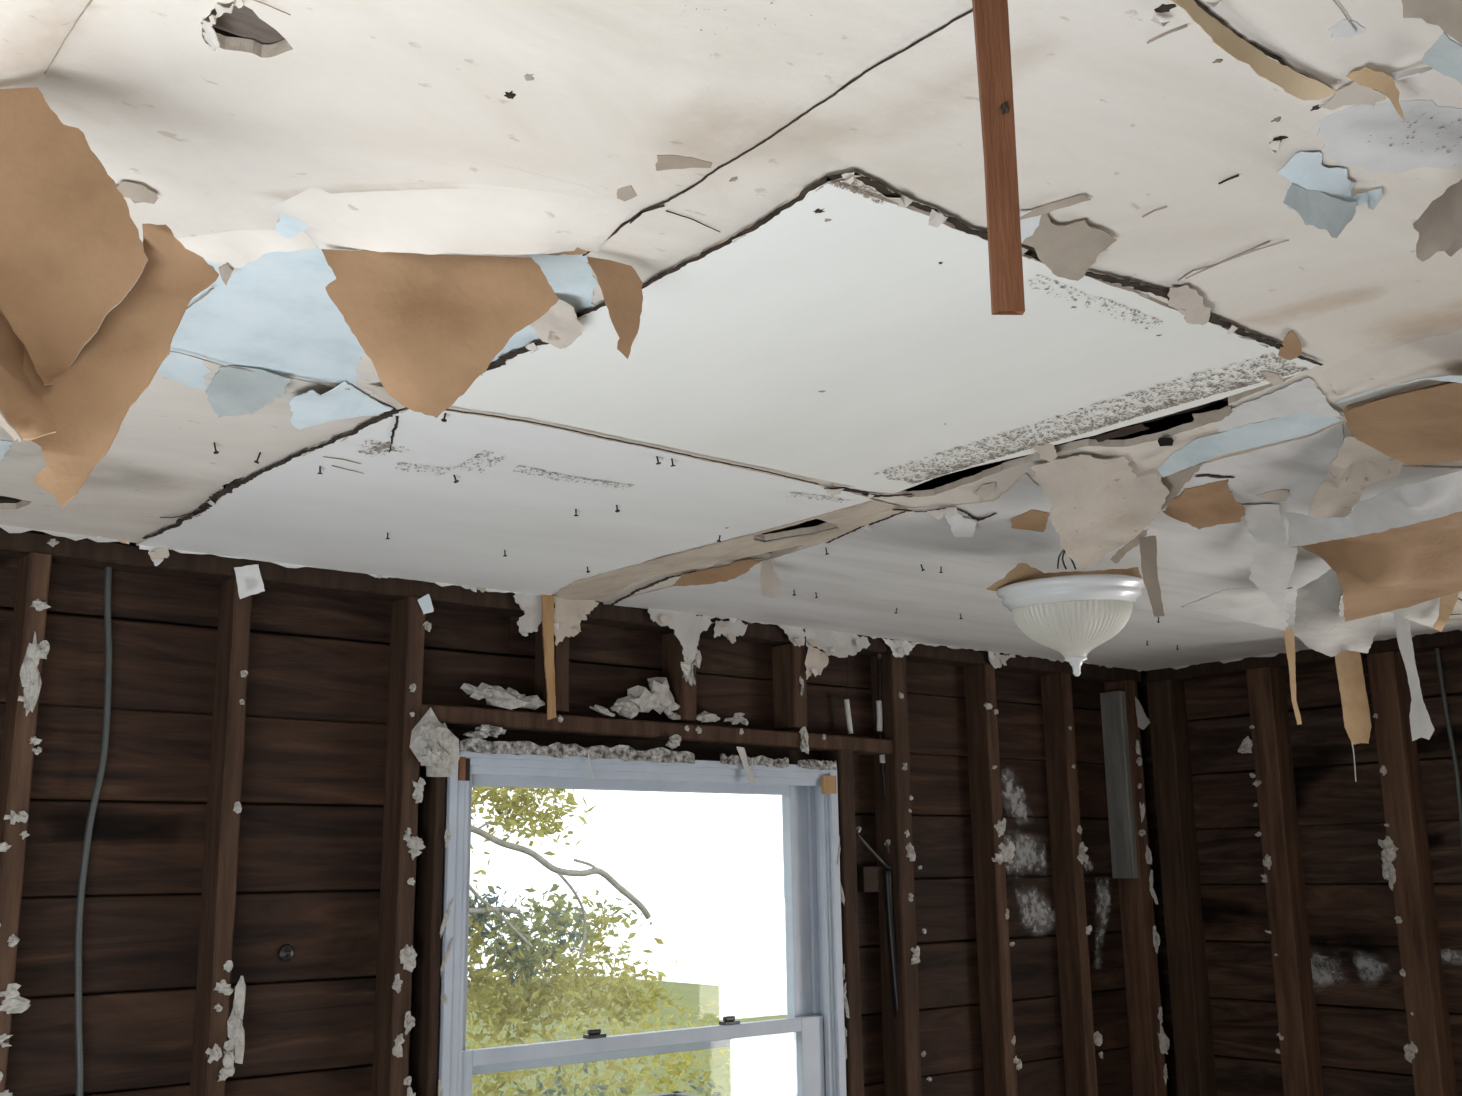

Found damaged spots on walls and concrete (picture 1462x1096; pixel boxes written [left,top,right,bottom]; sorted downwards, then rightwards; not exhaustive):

crack [1147,0,1315,80]
peeling [617,185,637,201]
crack [582,8,988,289]
peeling [1310,66,1462,173]
peeling [156,246,378,397]
peeling [490,325,539,364]
crack [481,341,550,376]
peeling [528,254,597,314]
crack [1085,240,1323,366]
crack [142,407,409,539]
crack [446,409,997,543]
spalling [556,500,905,600]